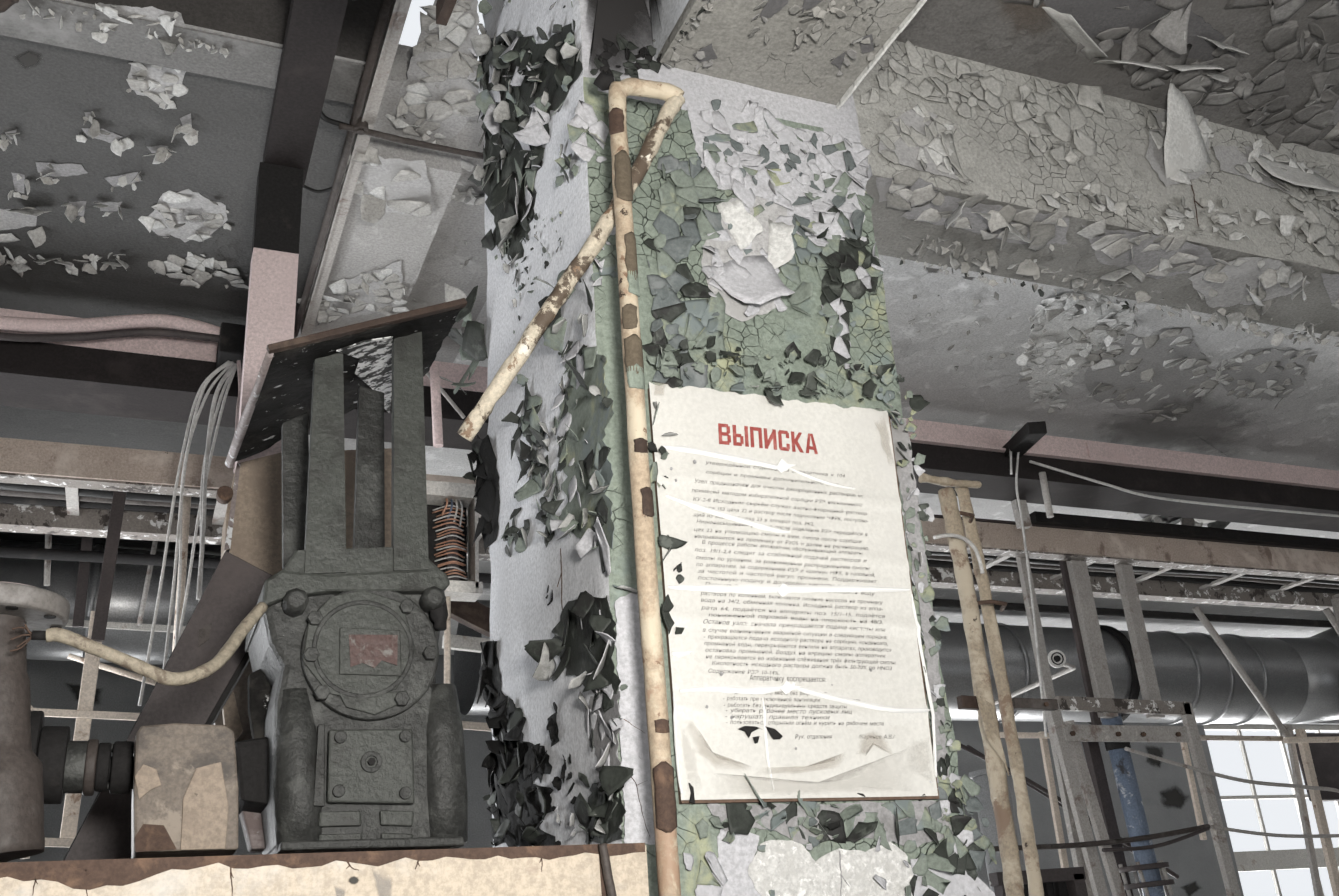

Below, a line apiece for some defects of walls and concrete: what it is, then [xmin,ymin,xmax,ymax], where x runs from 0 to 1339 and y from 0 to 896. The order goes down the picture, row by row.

spalling [0,0,249,289]
peeling [297,261,417,324]